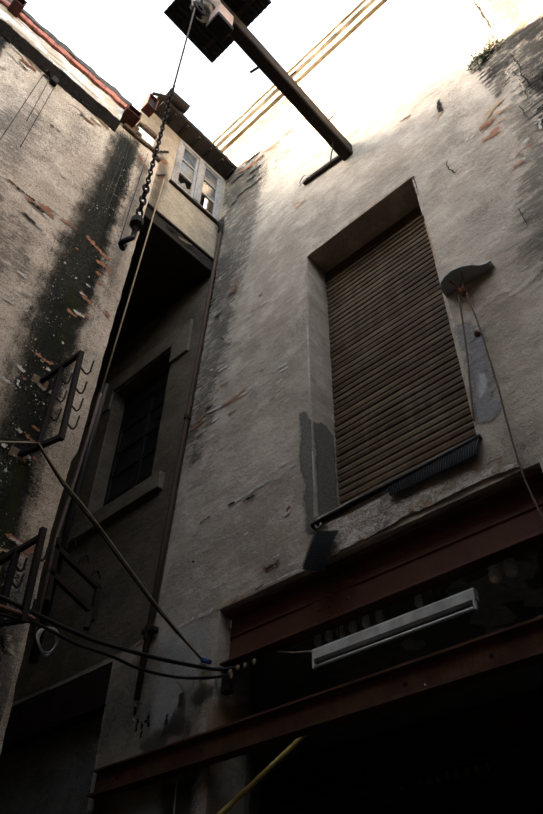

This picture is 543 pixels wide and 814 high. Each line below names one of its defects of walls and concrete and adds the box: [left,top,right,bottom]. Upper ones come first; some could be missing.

water stain [323,0,399,67]
crack [462,0,492,30]
water stain [469,0,543,130]
water stain [223,97,290,157]
flaking render [230,122,309,206]
flaking render [465,98,509,142]
flaking render [9,180,113,304]
water stain [0,131,141,723]
flaking render [0,533,34,555]
peeling [322,456,522,557]